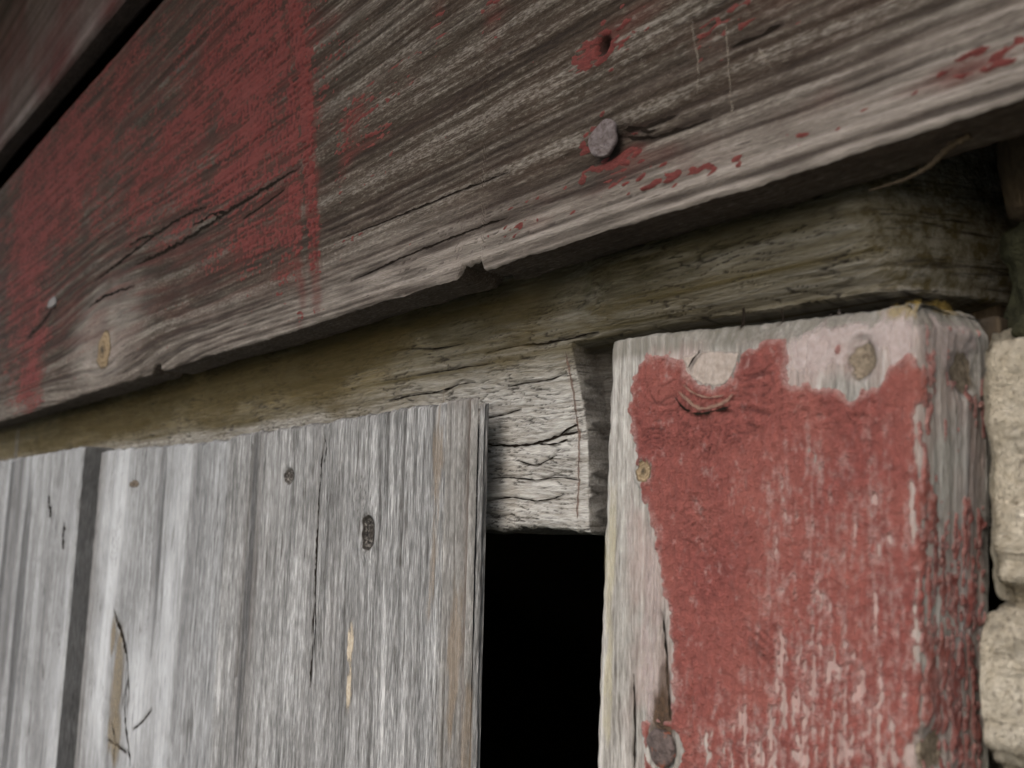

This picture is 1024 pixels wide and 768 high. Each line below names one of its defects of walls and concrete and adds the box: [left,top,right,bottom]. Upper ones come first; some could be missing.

peeling [570,4,650,73]
peeling [936,36,1024,79]
crack [90,166,301,307]
peeling [0,0,422,414]
peeling [563,111,717,199]
crack [489,424,579,501]
crack [310,439,327,681]
peeling [627,324,987,768]
crack [108,611,152,761]